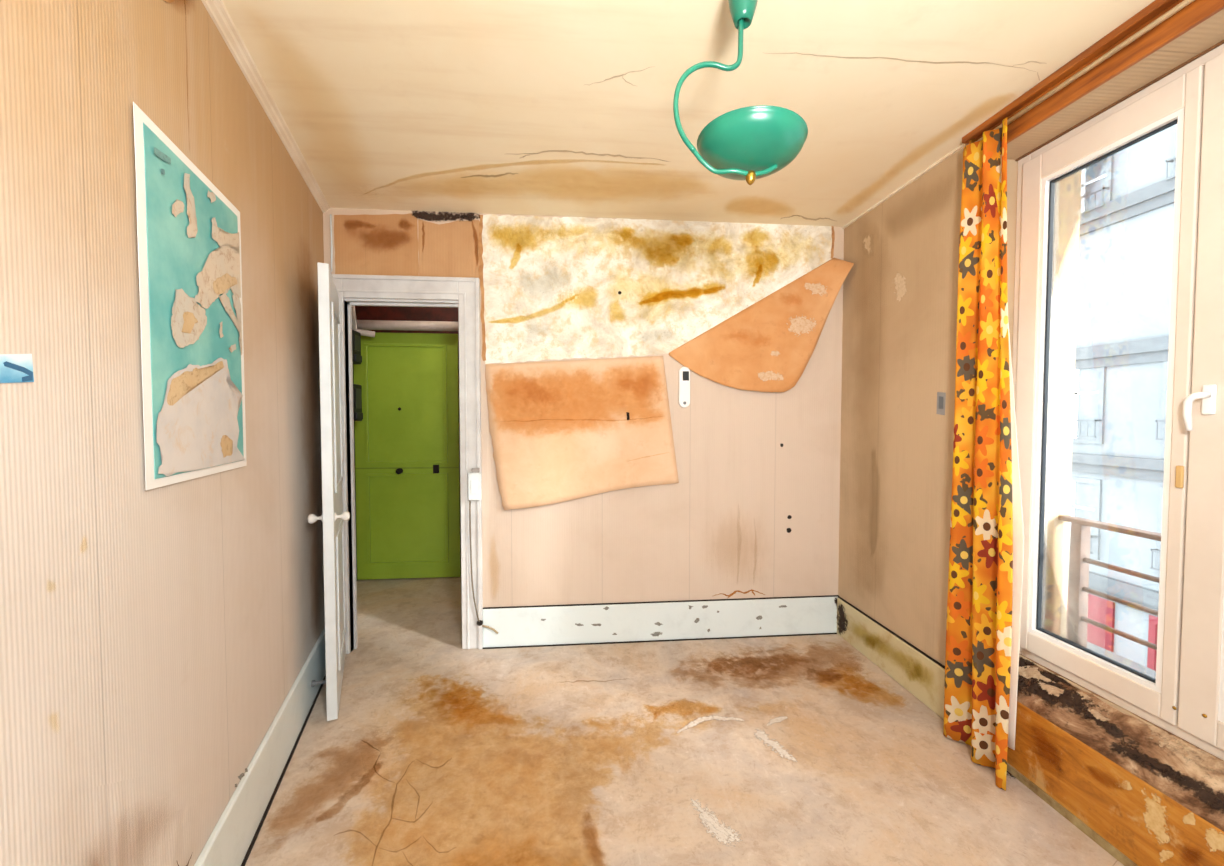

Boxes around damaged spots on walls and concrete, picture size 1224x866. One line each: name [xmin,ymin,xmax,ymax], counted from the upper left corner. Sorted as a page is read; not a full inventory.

water stain [412,211,480,221]
flaking render [478,214,835,364]
water stain [834,598,848,635]
water stain [1018,657,1224,813]
peeling [1118,780,1174,863]
peeling [1182,812,1224,852]